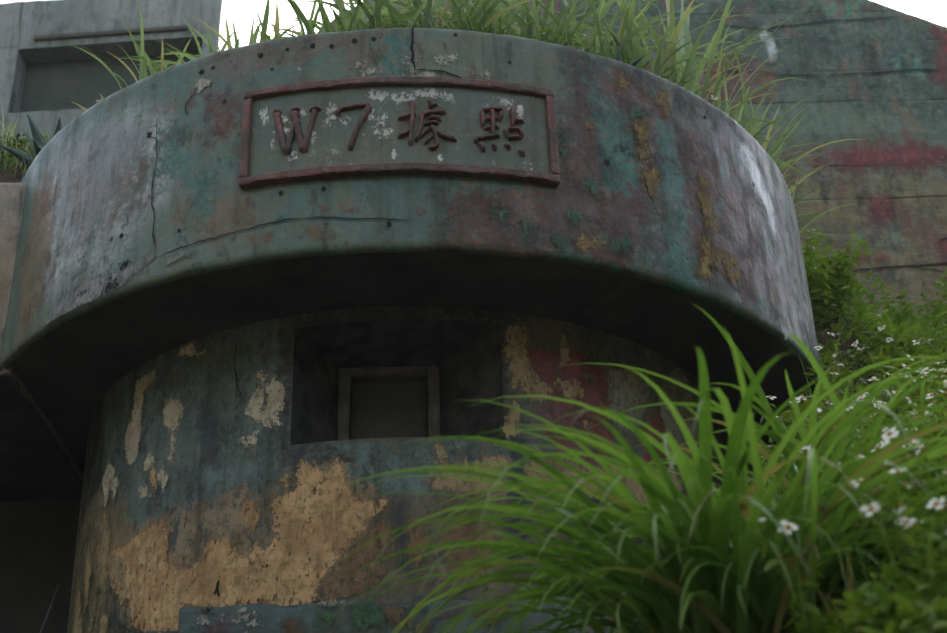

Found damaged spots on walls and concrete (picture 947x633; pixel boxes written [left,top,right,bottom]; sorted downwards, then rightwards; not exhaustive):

crack [410,24,461,78]
crack [147,119,415,258]
peeling [124,366,186,499]
peeling [239,370,286,448]
peeling [420,443,511,497]
peeling [500,324,586,439]
peeling [72,458,498,633]